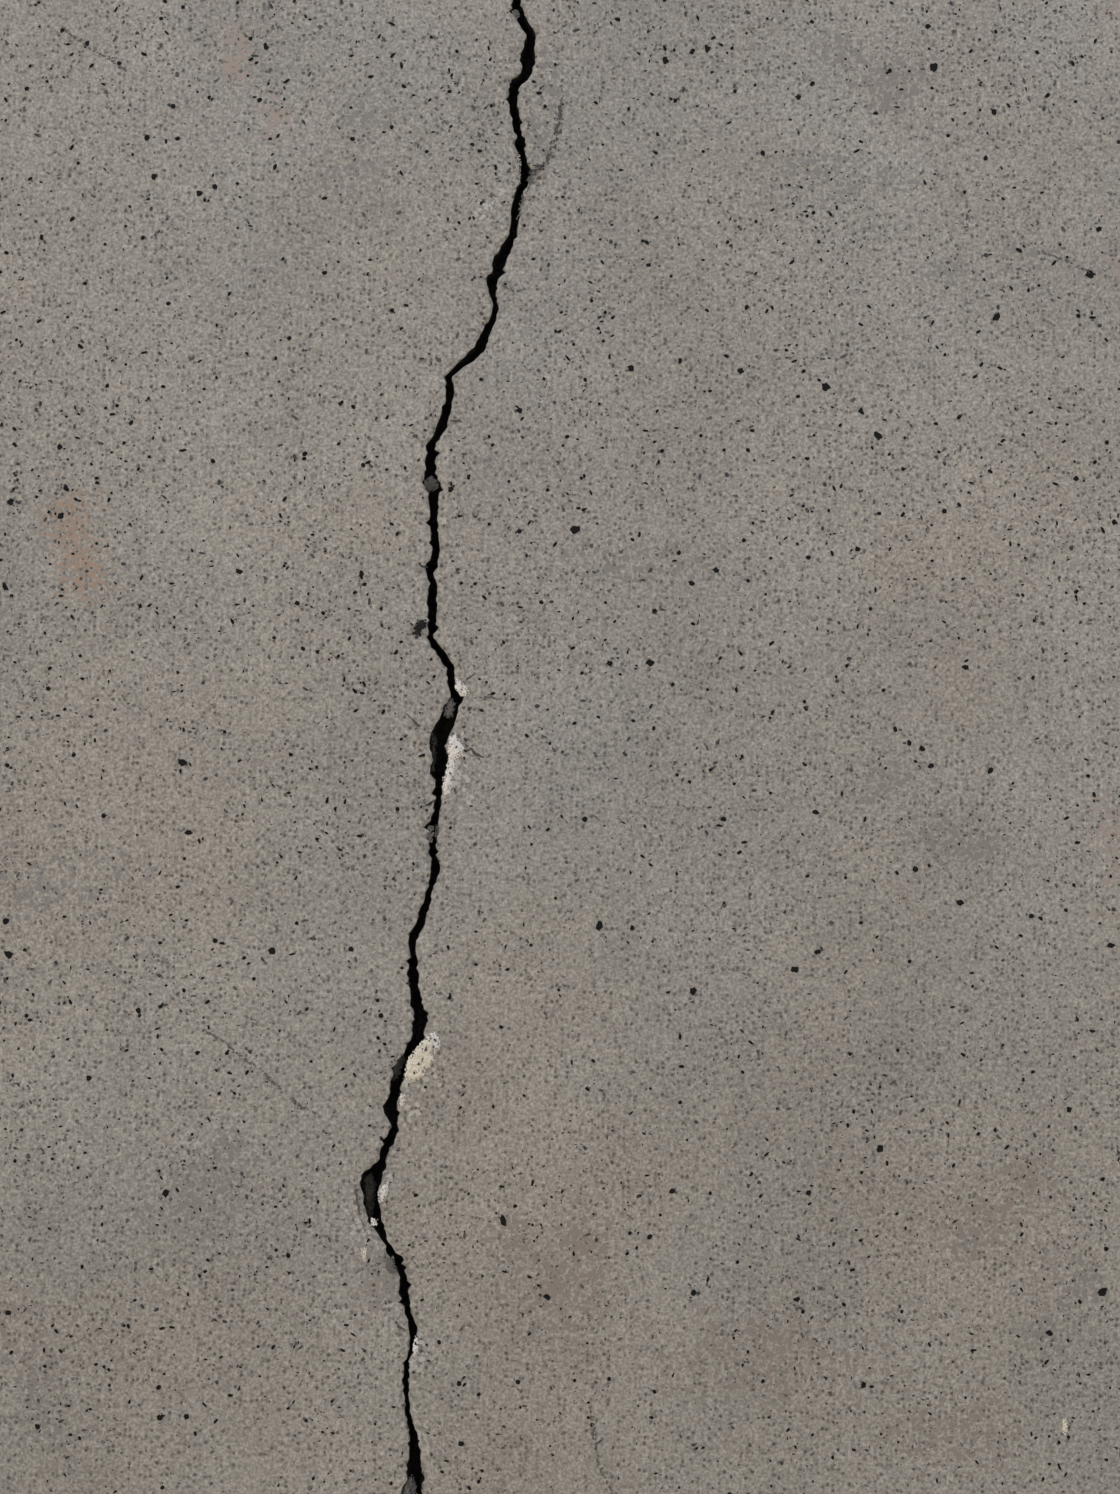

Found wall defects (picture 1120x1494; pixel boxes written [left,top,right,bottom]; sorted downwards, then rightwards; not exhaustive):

crack [353,0,564,1494]